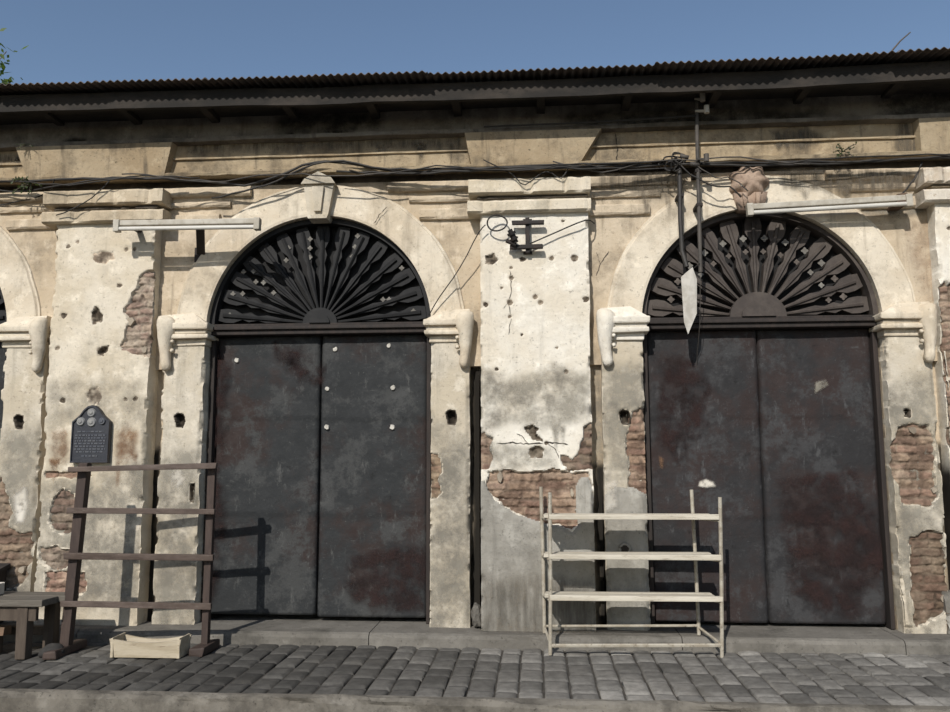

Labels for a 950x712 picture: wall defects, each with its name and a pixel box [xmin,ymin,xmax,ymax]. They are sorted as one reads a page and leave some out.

leakage [281,113,460,155]
leakage [567,109,812,125]
leakage [775,131,821,149]
leakage [887,92,950,151]
spalling [121,272,156,358]
spalling [0,477,69,592]
crack [499,434,567,457]
leakage [430,367,641,632]
spalling [481,424,592,529]
spalling [626,408,646,494]
spalling [889,424,937,507]
spalling [909,530,950,629]